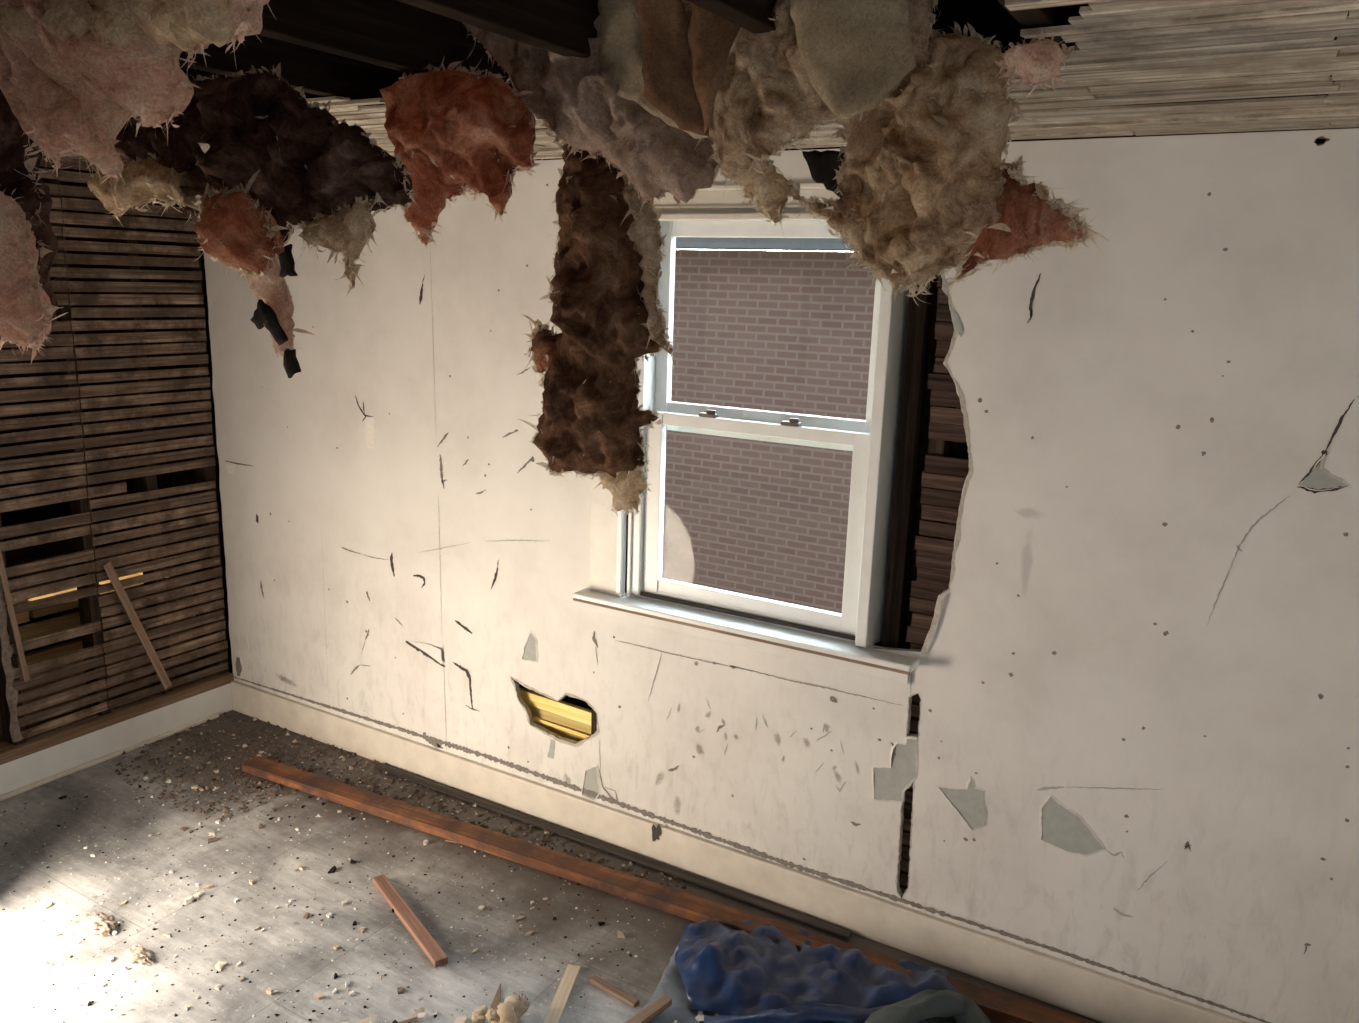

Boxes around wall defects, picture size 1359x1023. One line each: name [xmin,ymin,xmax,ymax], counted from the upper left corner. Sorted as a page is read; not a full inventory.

flaking render [921,270,988,655]
crack [1207,496,1289,625]
peeling [521,630,538,663]
peeling [547,739,555,759]
peeling [871,737,919,803]
peeling [936,772,988,841]
peeling [1039,794,1107,857]